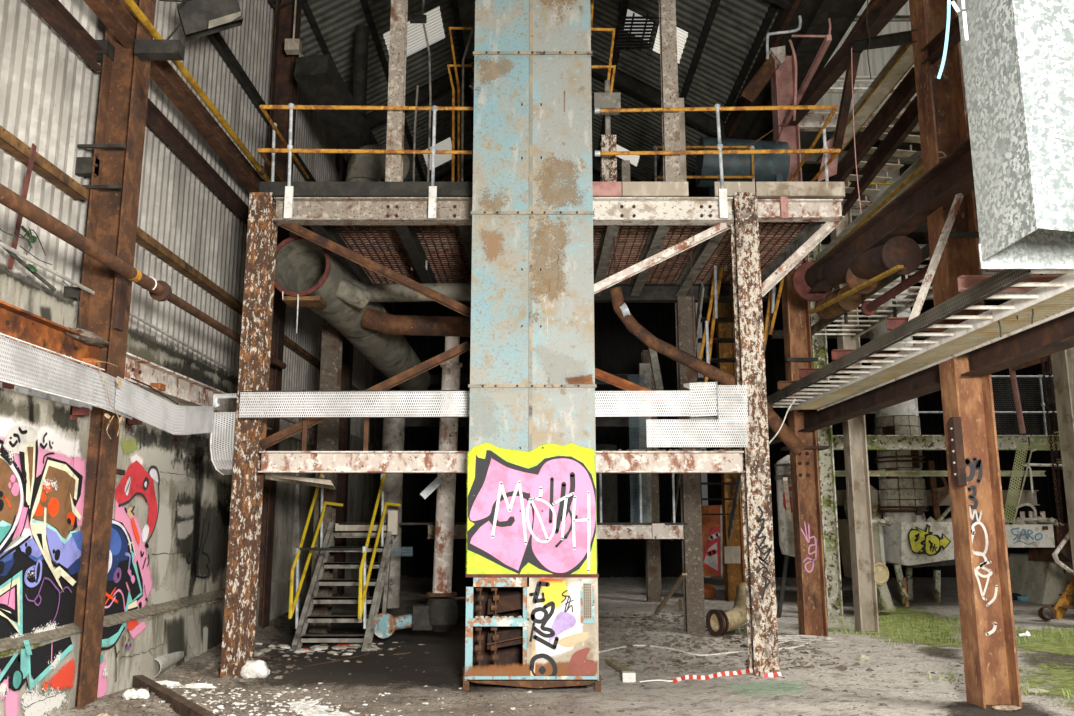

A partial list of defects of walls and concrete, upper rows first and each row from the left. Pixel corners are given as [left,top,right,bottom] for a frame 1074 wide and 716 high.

peeling [475,58,513,94]
peeling [480,188,508,211]
peeling [529,157,583,322]
damp [125,424,232,605]
corrosion [465,662,597,676]